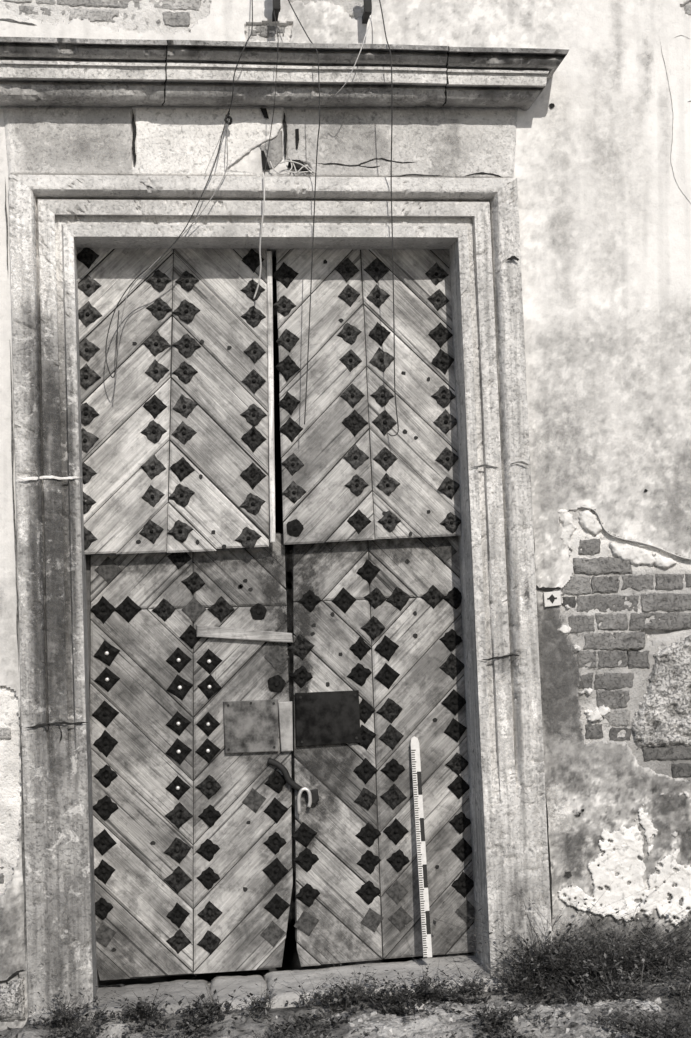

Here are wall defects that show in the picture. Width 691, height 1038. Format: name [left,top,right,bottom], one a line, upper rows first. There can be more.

flaking render [0,0,211,34]
flaking render [245,23,292,43]
crack [130,109,138,164]
crack [281,113,289,160]
crack [320,158,503,178]
crack [533,529,563,592]
peeling [517,563,529,631]
flaking render [557,506,691,798]
peeling [497,676,513,756]
flaking render [0,686,22,893]
crack [545,790,553,923]
peeling [540,804,691,927]